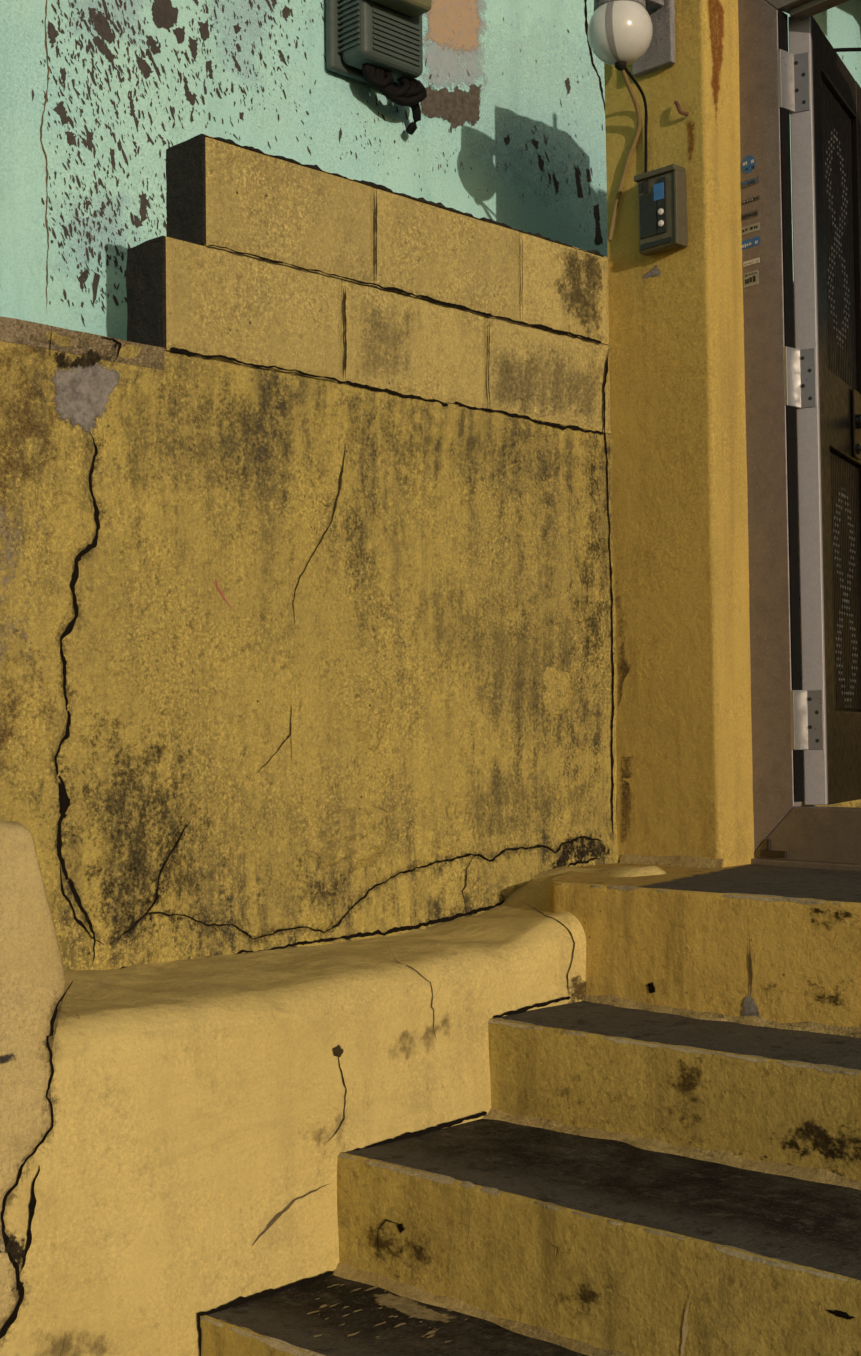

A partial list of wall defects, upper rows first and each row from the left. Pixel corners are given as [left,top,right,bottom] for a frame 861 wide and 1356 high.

peeling [32,0,326,326]
peeling [339,0,607,245]
crack [585,0,605,108]
rust [709,0,724,111]
water stain [0,339,56,493]
water stain [575,464,629,705]
water stain [0,678,21,747]
water stain [79,732,205,930]
crack [0,187,614,1339]
water stain [621,757,631,842]
crack [197,1271,334,1356]